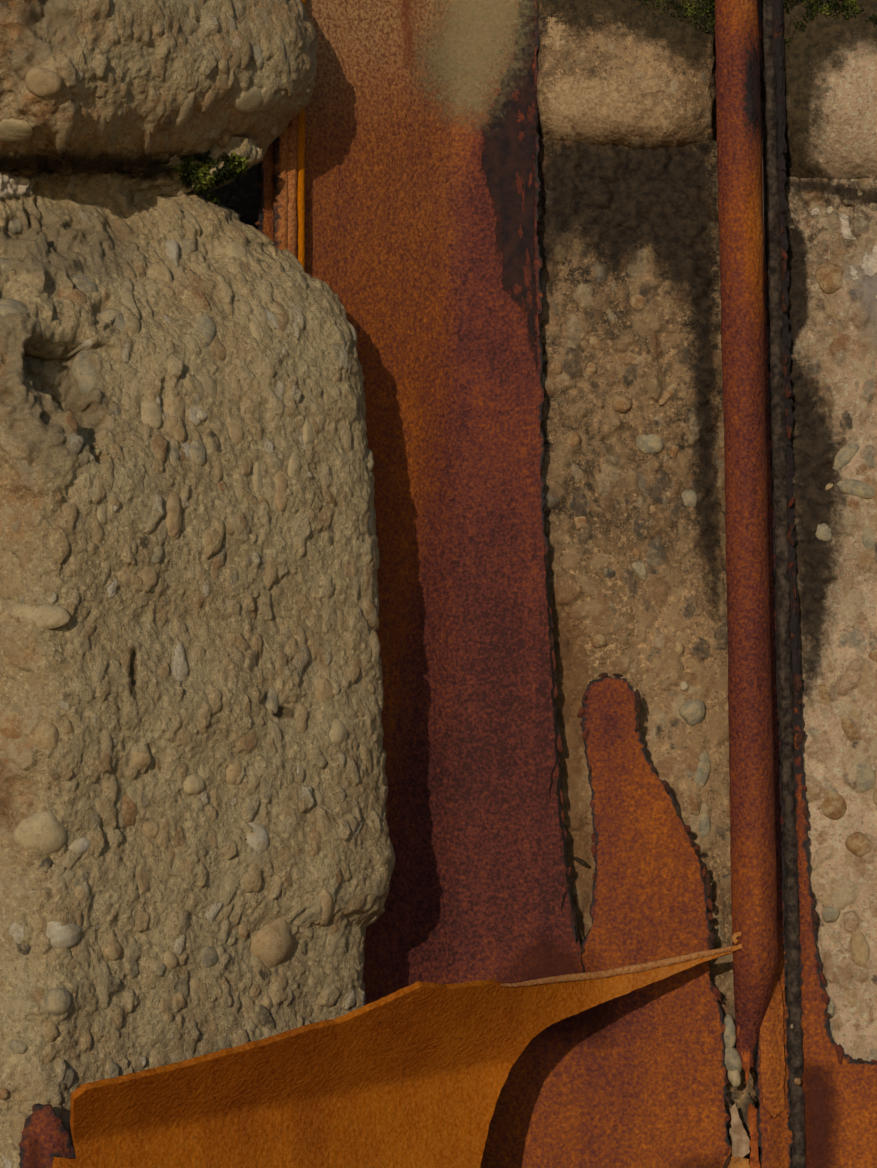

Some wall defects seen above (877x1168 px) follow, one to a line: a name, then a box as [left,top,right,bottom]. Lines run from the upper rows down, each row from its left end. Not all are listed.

leakage [537,139,720,604]
spalling [127,645,137,695]
spalling [274,707,293,718]
rust [520,943,587,982]
rust [543,1002,608,1036]
rust [727,980,785,1168]